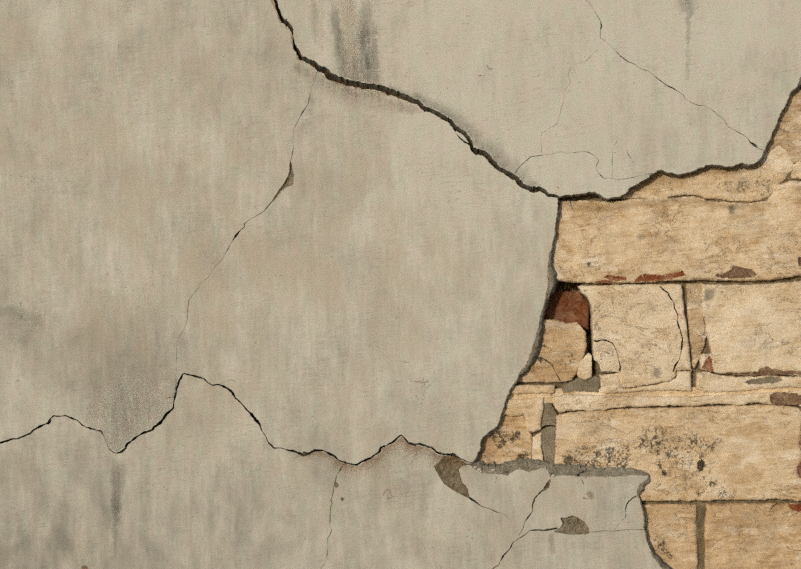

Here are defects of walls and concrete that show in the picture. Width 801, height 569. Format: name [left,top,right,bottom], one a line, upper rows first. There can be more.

crack [274,0,764,215]
crack [0,203,468,568]
crack [594,339,621,373]
spalling [434,77,801,569]
crack [660,286,705,372]
crack [492,490,558,569]
crack [595,496,642,532]